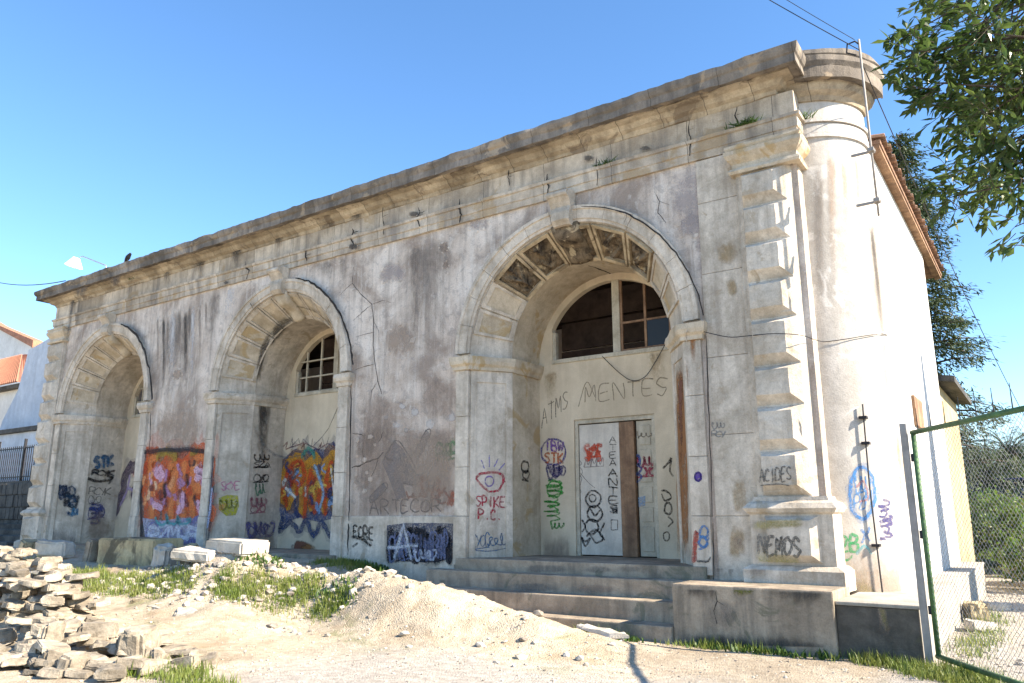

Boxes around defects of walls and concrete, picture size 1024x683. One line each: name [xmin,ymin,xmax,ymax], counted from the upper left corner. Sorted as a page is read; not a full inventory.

water stain [162,310,206,368]
crack [296,252,391,549]
crack [581,159,723,623]
rust [676,367,688,543]